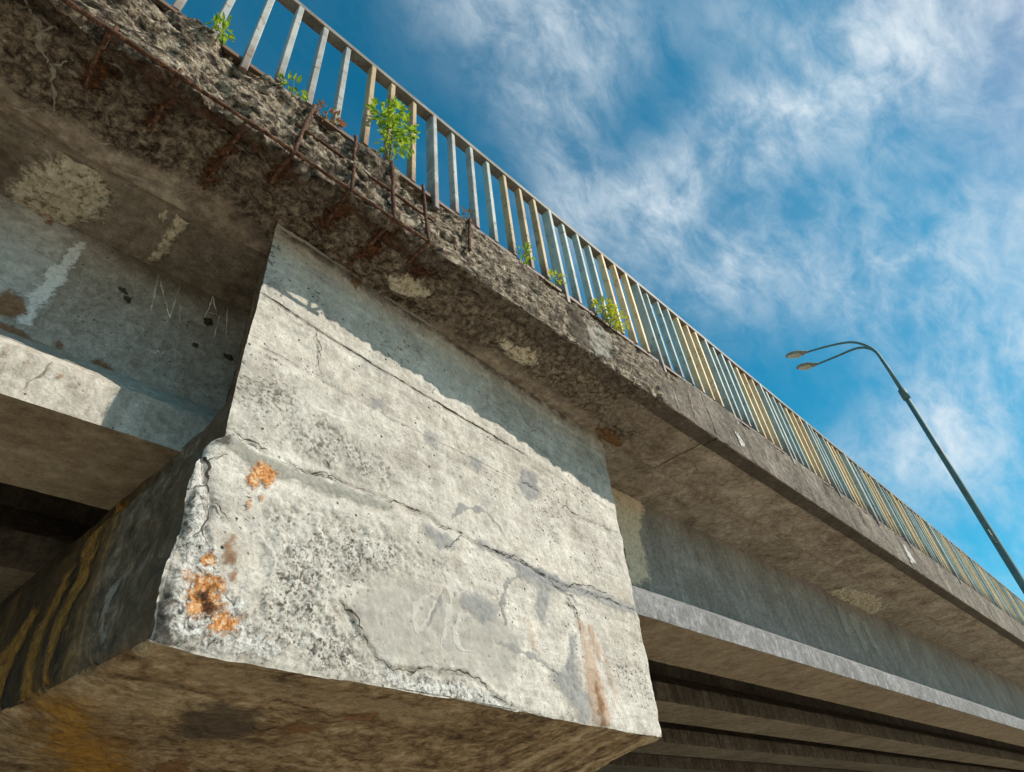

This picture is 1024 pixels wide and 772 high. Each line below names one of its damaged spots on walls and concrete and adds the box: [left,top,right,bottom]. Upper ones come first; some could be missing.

rust [69,56,121,97]
spalling [5,150,113,227]
water stain [0,200,87,326]
rust [348,228,401,288]
rust [246,461,277,506]
rust [182,534,245,635]
crack [188,433,633,637]
crack [340,602,505,702]
rust [581,628,609,727]